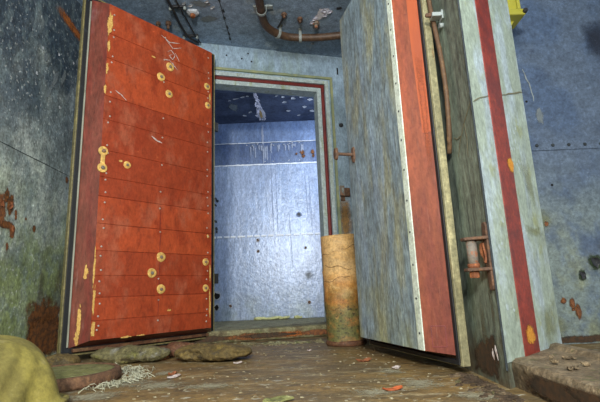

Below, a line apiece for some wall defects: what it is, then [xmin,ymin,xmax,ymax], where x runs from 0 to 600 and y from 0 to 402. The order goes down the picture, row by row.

corrosion [0,188,17,250]
corrosion [26,298,60,355]
corrosion [183,329,327,343]
corrosion [561,298,582,320]